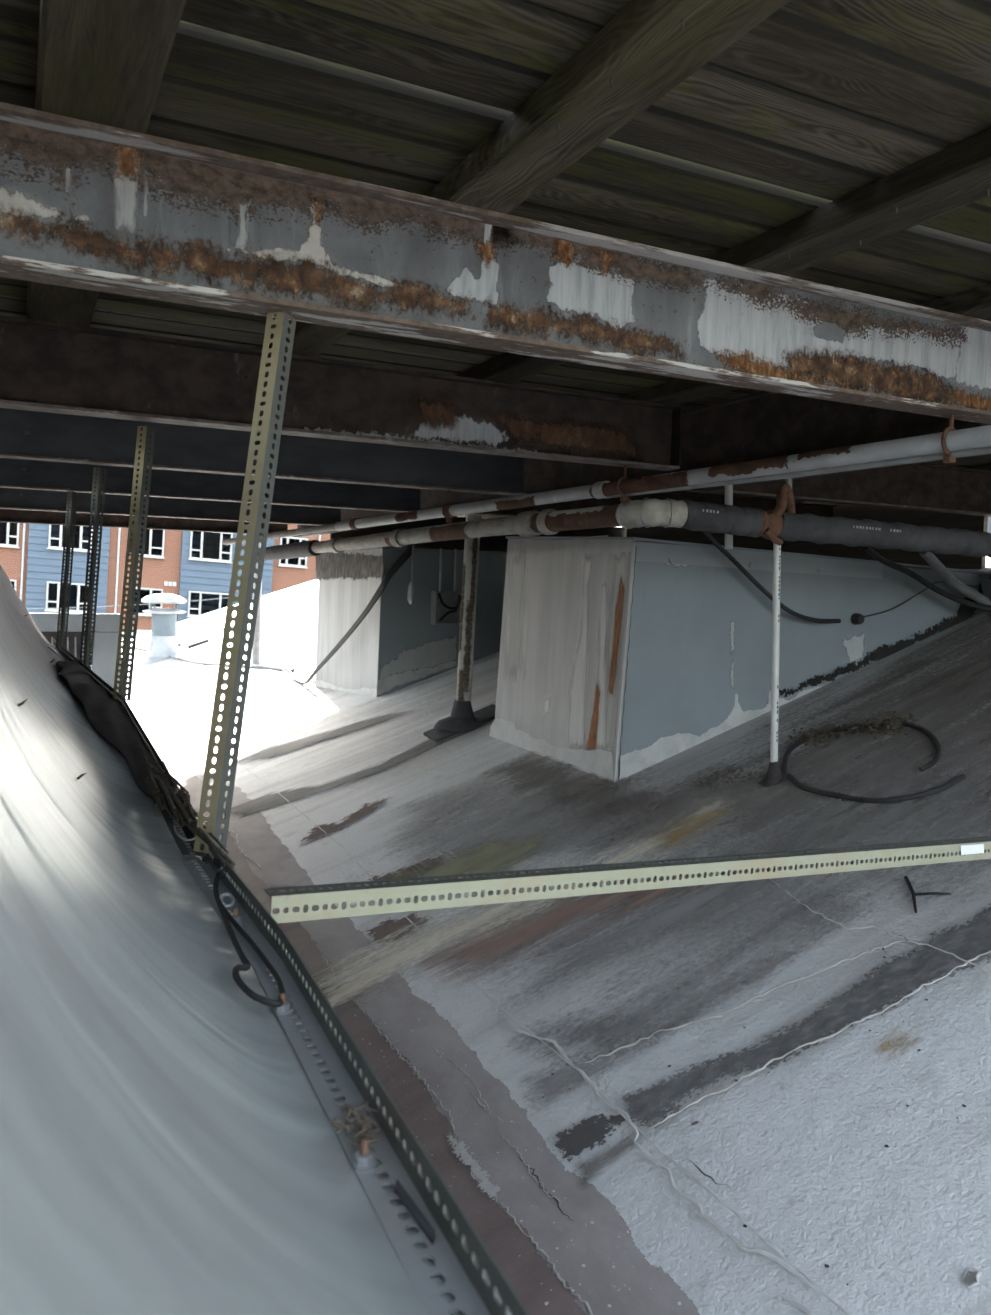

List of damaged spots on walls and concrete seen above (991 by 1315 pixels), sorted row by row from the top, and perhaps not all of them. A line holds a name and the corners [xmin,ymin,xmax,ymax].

peeling [0,187,60,218]
rust [0,120,684,360]
rust [136,149,991,411]
peeling [546,262,636,330]
peeling [697,279,991,390]
peeling [304,414,555,454]
rust [415,397,458,430]
rust [708,445,855,478]
rust [494,496,620,533]
rust [586,578,624,751]
peeling [489,682,831,782]
peeling [126,673,700,1315]